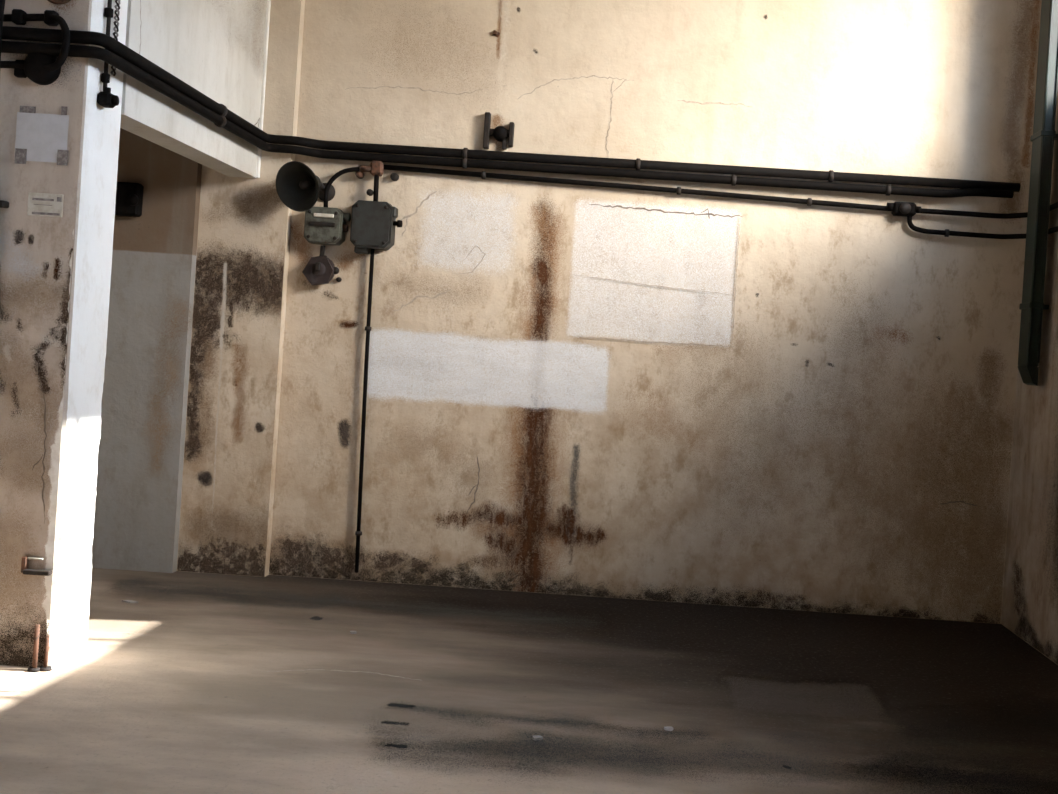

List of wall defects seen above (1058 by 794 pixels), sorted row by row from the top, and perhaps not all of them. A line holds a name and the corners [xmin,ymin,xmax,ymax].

crack [518,75,634,155]
water stain [54,247,73,388]
water stain [138,179,284,478]
corrosion [512,197,568,352]
crack [589,204,742,219]
corrosion [434,388,609,593]
water stain [177,270,1058,664]